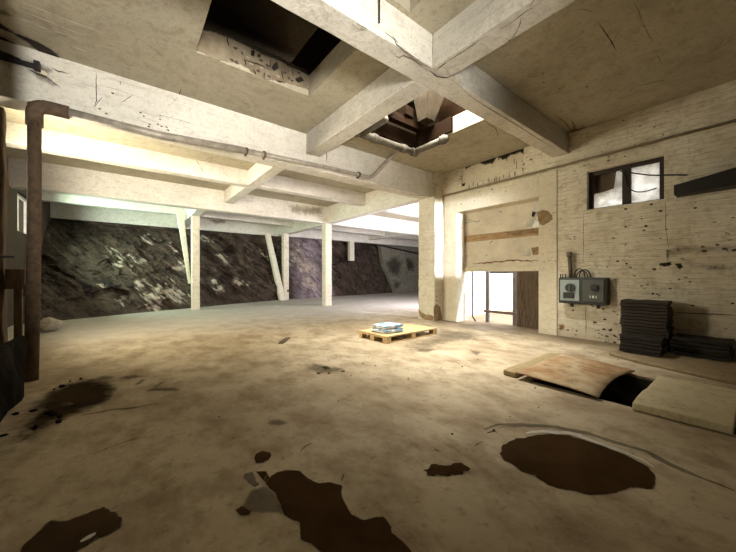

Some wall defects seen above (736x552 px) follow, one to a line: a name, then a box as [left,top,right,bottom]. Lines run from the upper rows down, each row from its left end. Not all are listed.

peeling [8,62,73,86]
peeling [196,28,312,90]
crack [385,0,539,69]
spalling [460,149,539,179]
spalling [526,201,555,228]
damp [19,376,151,440]
damp [485,423,734,491]